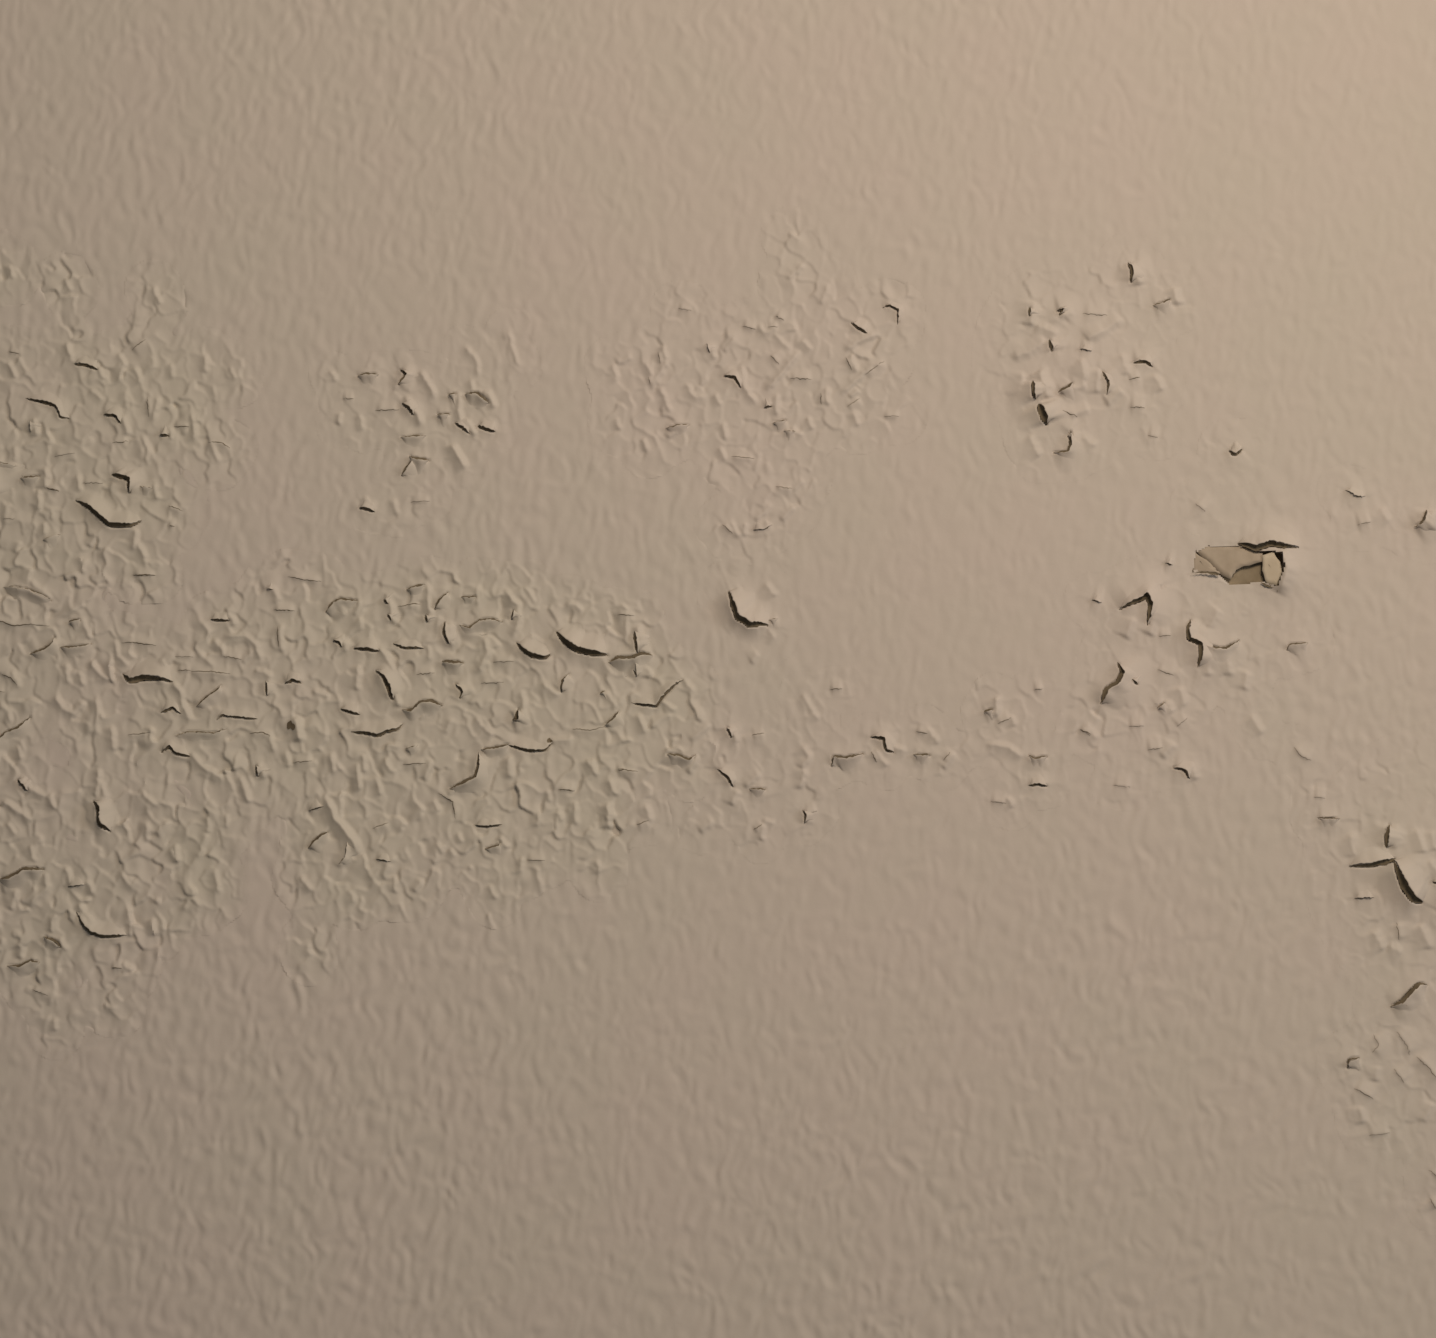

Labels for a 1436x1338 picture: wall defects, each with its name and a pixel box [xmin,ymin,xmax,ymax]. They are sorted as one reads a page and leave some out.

peeling [0,228,801,1060]
peeling [1060,504,1436,1028]